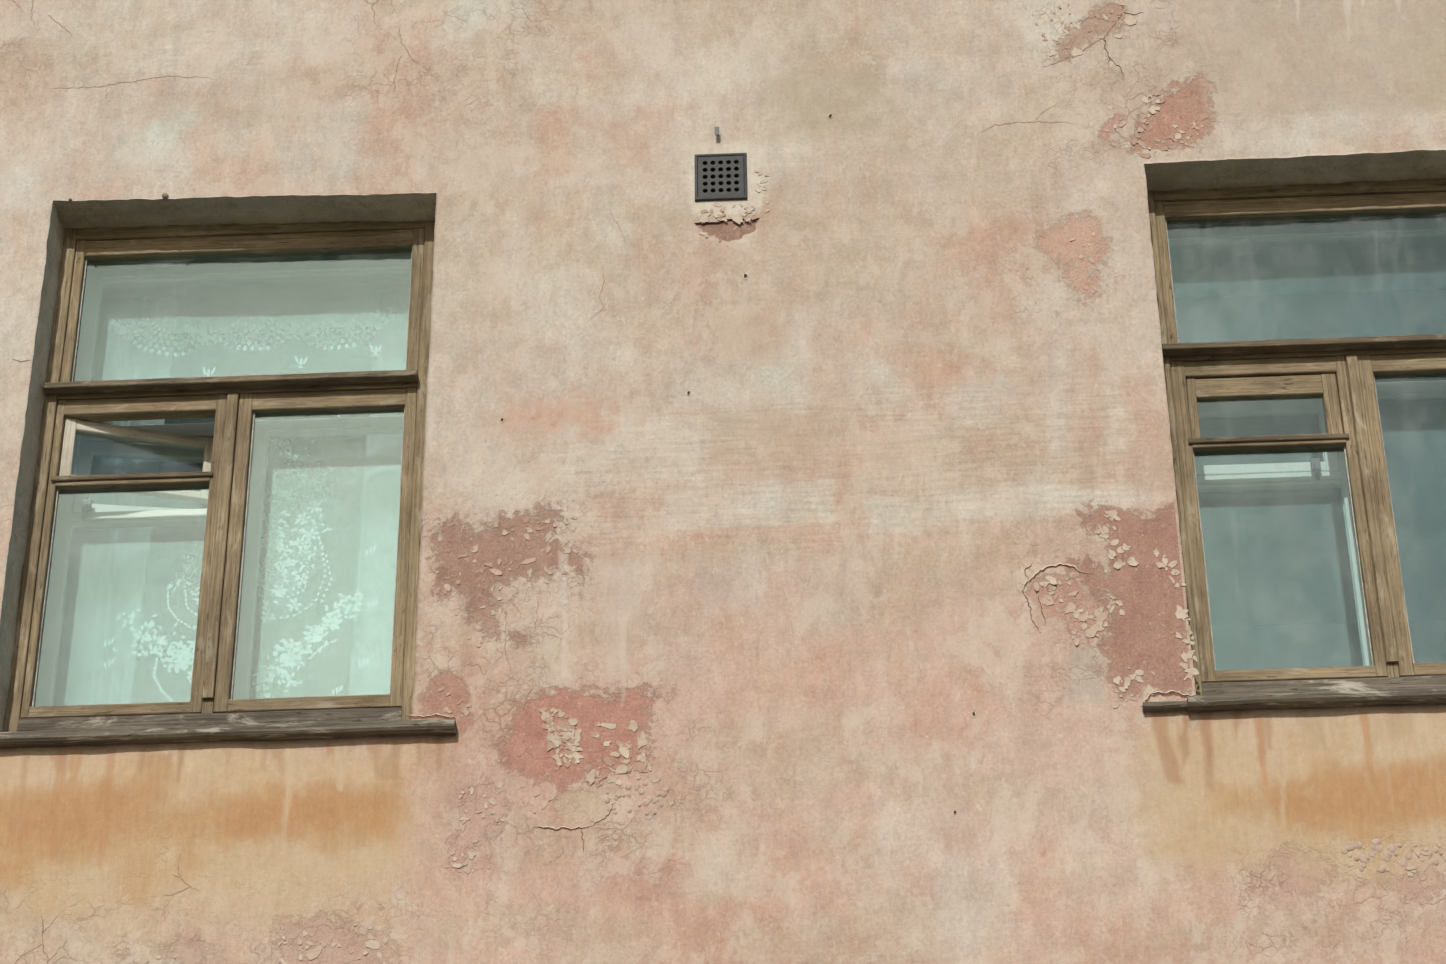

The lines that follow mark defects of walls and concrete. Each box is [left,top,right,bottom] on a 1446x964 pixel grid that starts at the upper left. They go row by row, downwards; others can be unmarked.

peeling [1025,0,1139,68]
crack [1045,0,1143,78]
peeling [1091,90,1208,158]
water stain [1137,0,1446,153]
spalling [696,206,758,242]
peeling [423,494,592,657]
peeling [1014,491,1199,709]
rust [0,736,441,954]
peeling [415,662,671,832]
rust [1108,687,1446,916]